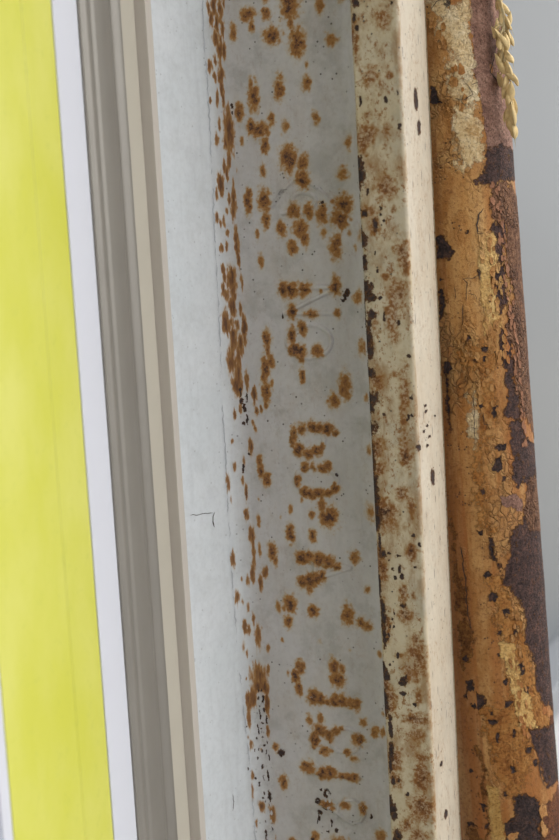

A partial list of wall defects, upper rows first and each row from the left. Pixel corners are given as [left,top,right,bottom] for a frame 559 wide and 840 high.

corrosion [470,0,513,150]
peeling [425,0,536,489]
corrosion [489,180,534,435]
corrosion [204,0,444,840]
corrosion [471,376,500,536]
corrosion [500,470,541,533]
corrosion [448,518,475,671]
peeling [463,680,501,743]
corrosion [466,574,554,840]
peeling [476,516,558,789]
peeling [467,785,548,840]
corrosion [540,781,559,840]